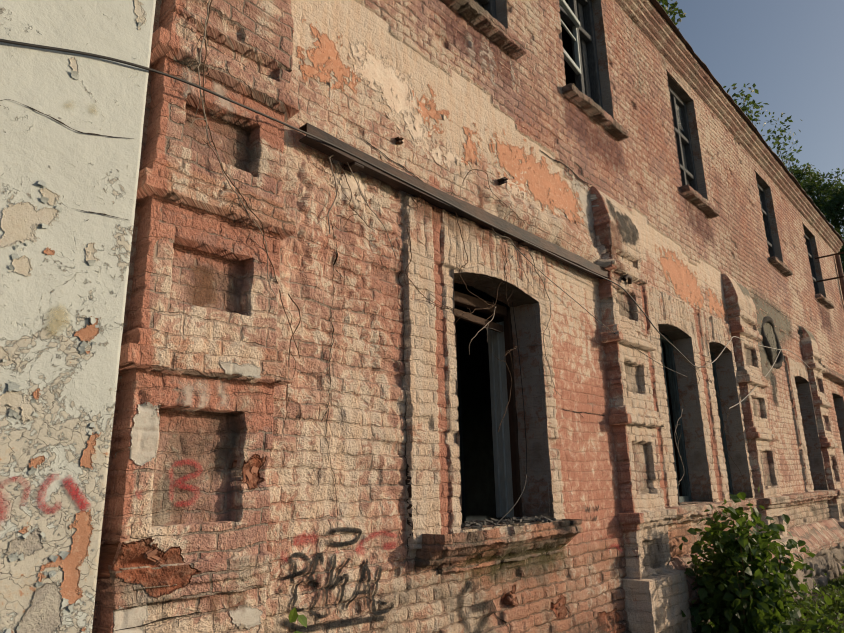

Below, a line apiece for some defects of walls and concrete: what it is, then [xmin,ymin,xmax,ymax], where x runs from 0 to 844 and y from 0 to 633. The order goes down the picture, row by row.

peeling [134,0,147,30]
crack [0,99,133,139]
flaking render [297,19,611,240]
peeling [0,180,63,276]
flaking render [655,244,742,323]
peeling [74,316,99,354]
peeling [0,381,42,424]
crack [321,226,342,534]
peeling [28,456,47,475]
peeling [80,422,101,470]
spalling [231,453,267,490]
spalling [4,509,202,633]